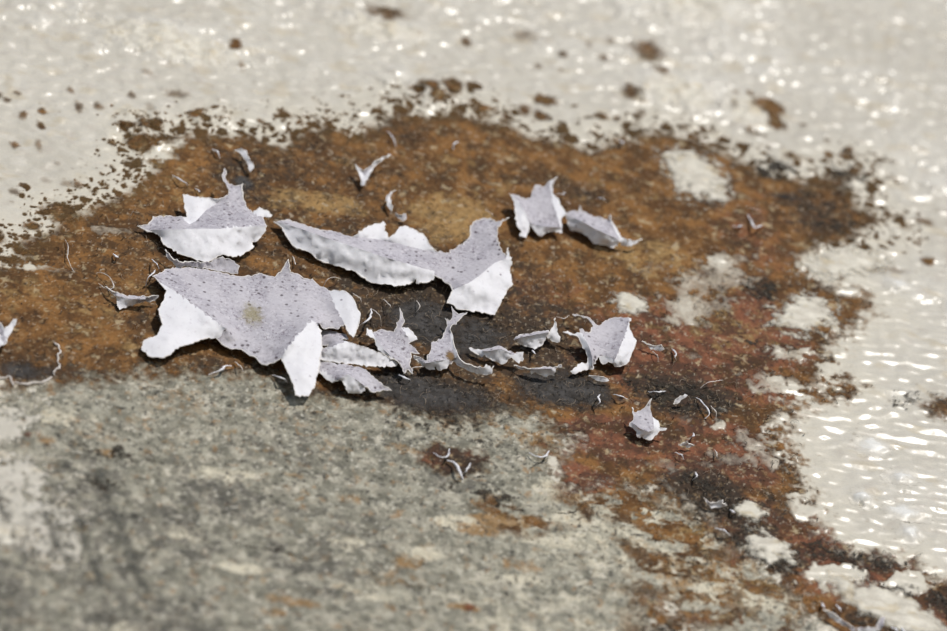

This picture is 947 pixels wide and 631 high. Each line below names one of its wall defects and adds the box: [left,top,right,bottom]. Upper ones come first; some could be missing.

corrosion [418,79,448,104]
corrosion [443,78,463,93]
peeling [235,149,254,172]
peeling [355,154,392,186]
damp [1,363,48,378]
corrosion [310,373,408,411]
damp [377,373,500,448]
spalling [0,168,886,631]
damp [78,443,134,462]
corrosion [418,441,489,477]
damp [475,476,524,512]
corrosion [905,571,947,627]